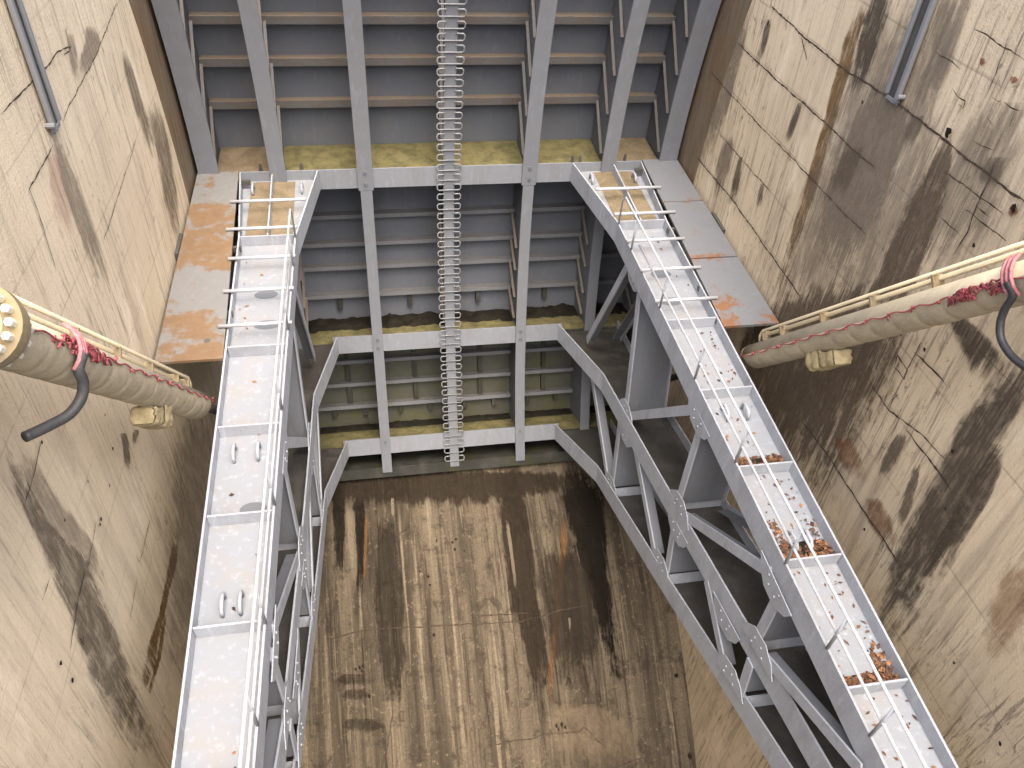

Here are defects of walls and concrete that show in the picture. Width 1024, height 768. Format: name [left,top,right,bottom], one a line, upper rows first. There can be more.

crack [2,4,117,119]
crack [697,158,800,296]
crack [738,43,875,167]
corrosion [785,12,864,270]
water stain [741,0,969,350]
crack [771,6,1024,255]
water stain [12,471,144,735]
corrosion [143,536,178,693]
water stain [332,469,620,724]
water stain [743,335,902,485]
crack [870,343,953,493]
water stain [880,319,1024,638]